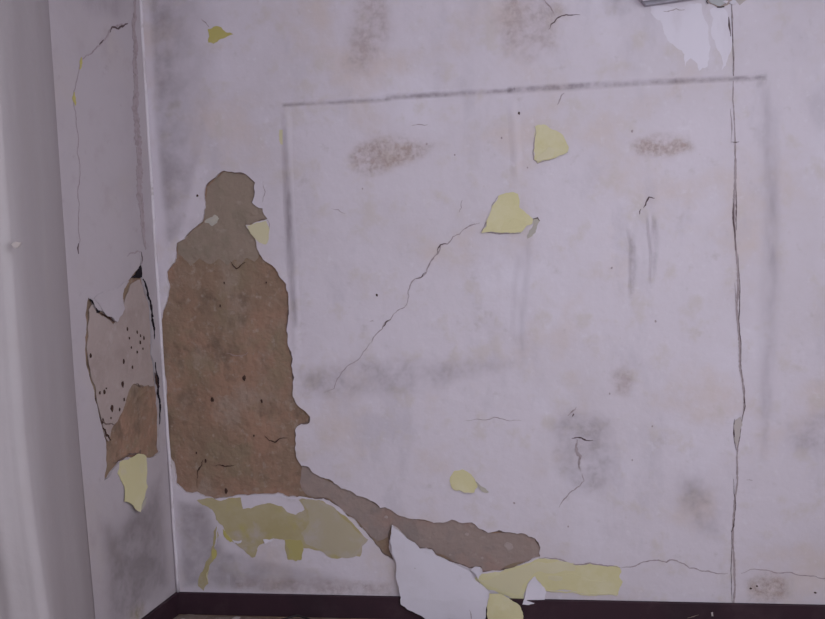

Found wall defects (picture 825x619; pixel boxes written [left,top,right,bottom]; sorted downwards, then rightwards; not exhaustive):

peeling [202,20,233,44]
spalling [706,0,736,8]
crack [127,0,147,261]
peeling [533,124,569,164]
spalling [85,171,623,619]
crack [331,201,479,390]
crack [559,437,592,507]
crack [622,4,825,603]